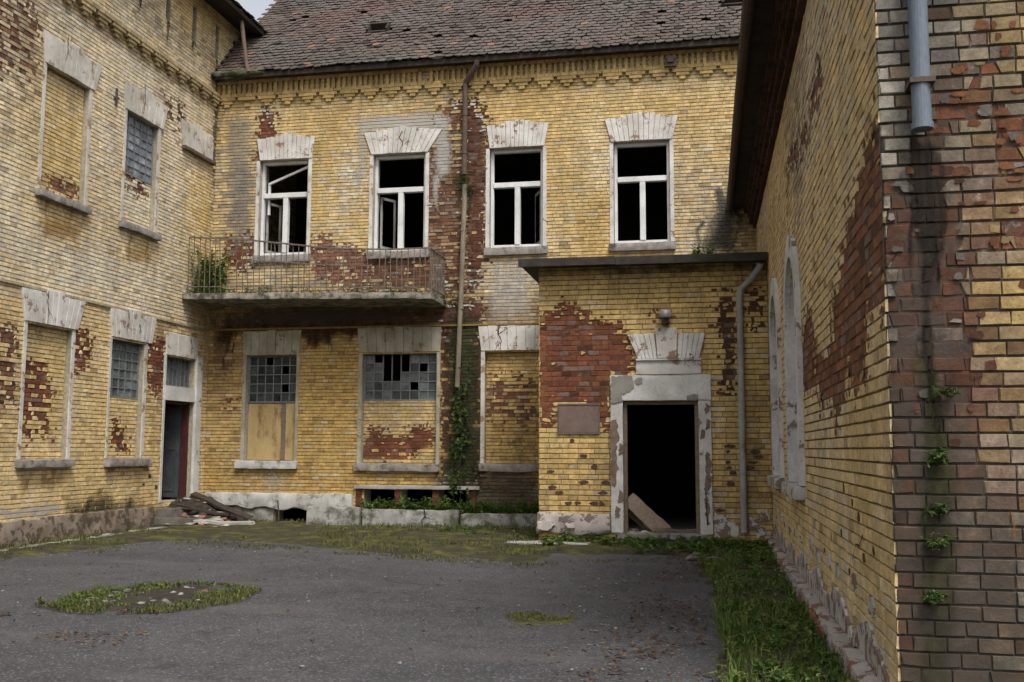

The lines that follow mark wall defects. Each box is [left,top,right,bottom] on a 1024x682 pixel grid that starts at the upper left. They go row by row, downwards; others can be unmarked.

spalling [41,172,80,202]
spalling [252,106,282,161]
spalling [0,321,58,447]
spalling [70,328,96,375]
spalling [110,417,132,455]
spalling [147,336,166,399]
spalling [310,93,643,518]
spalling [708,286,766,395]
spalling [801,114,997,436]
damp [909,132,952,682]
flaking render [686,394,890,682]